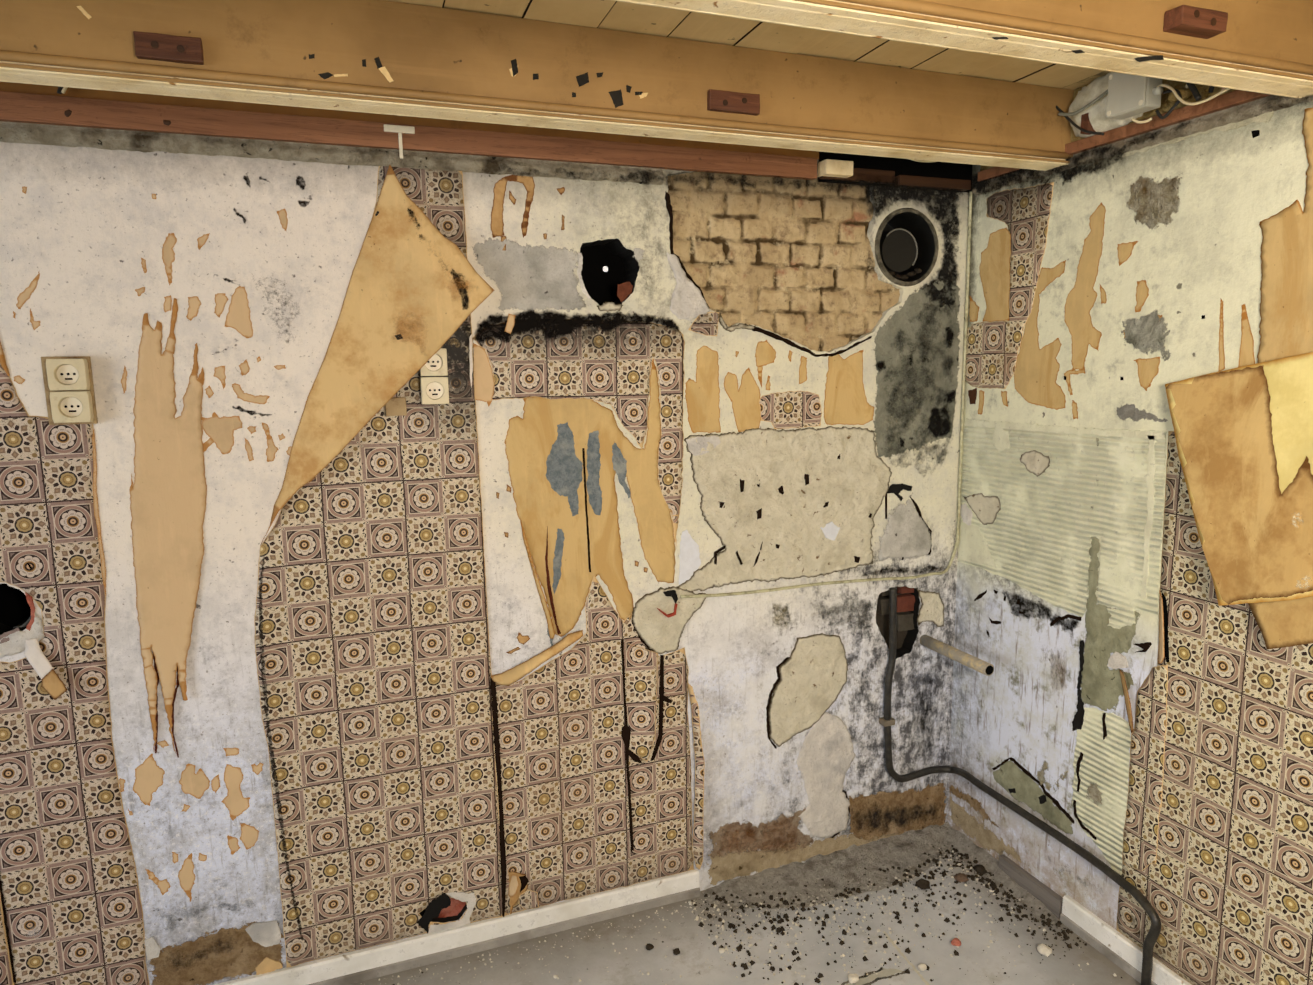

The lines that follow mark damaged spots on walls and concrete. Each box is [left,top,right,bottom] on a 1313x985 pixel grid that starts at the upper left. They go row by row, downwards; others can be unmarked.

flaking render [1126,176,1180,229]
flaking render [667,172,900,352]
water stain [556,131,1160,465]
peeling [201,165,494,546]
flaking render [1121,310,1170,361]
water stain [821,598,872,633]
water stain [1002,592,1079,632]
water stain [910,671,939,748]
peeling [179,748,263,855]
water stain [847,780,998,840]
spalling [417,892,476,934]
flaking render [144,920,284,985]